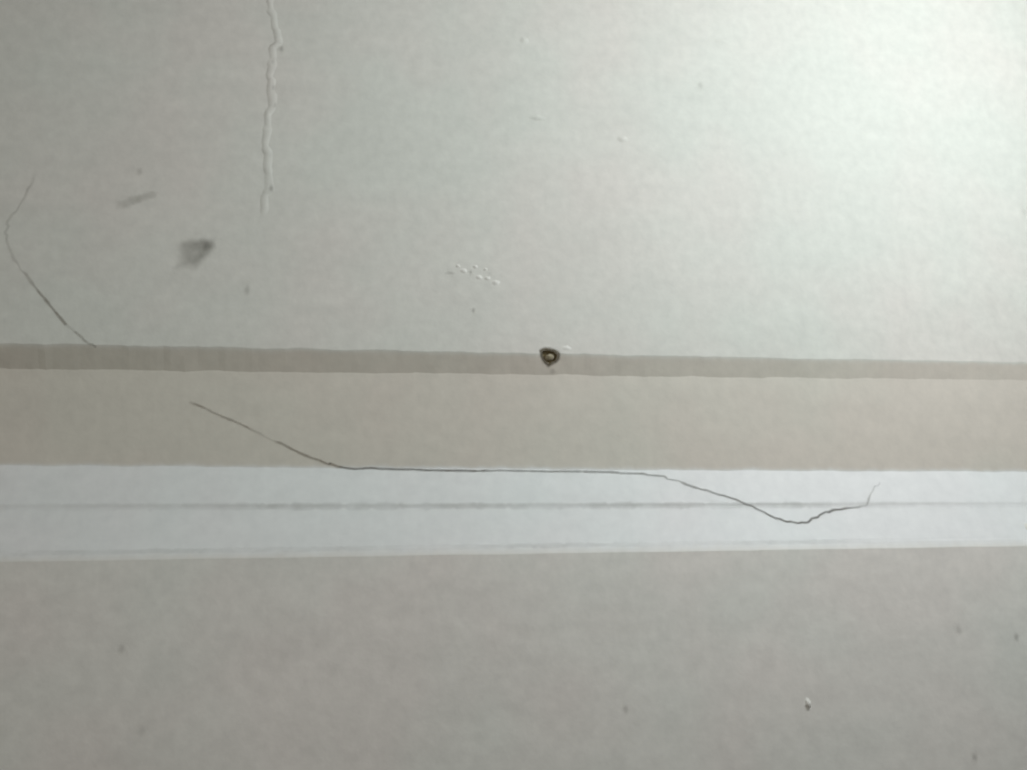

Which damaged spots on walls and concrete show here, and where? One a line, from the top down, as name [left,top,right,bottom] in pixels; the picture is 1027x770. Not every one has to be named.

crack [339,465,485,473]
crack [766,508,846,523]